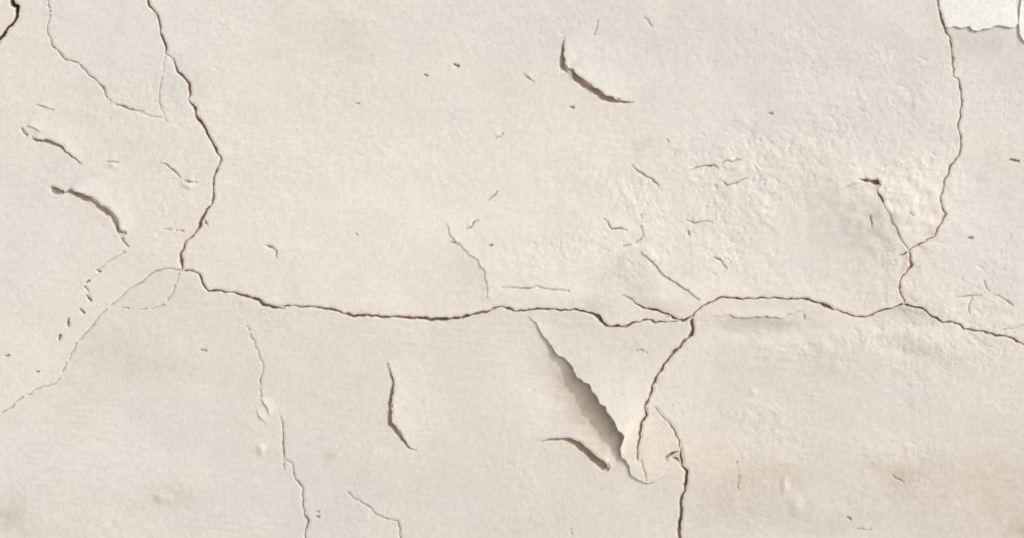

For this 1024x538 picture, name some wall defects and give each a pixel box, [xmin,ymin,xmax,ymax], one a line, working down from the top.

crack [0,0,20,41]
crack [47,1,107,97]
flaking render [559,13,663,104]
flaking render [940,0,1024,41]
flaking render [21,111,146,246]
crack [111,0,1024,479]
flaking render [387,350,434,450]
flaking render [527,311,724,483]
crack [281,419,310,538]
crack [348,492,401,538]
crack [655,407,689,538]